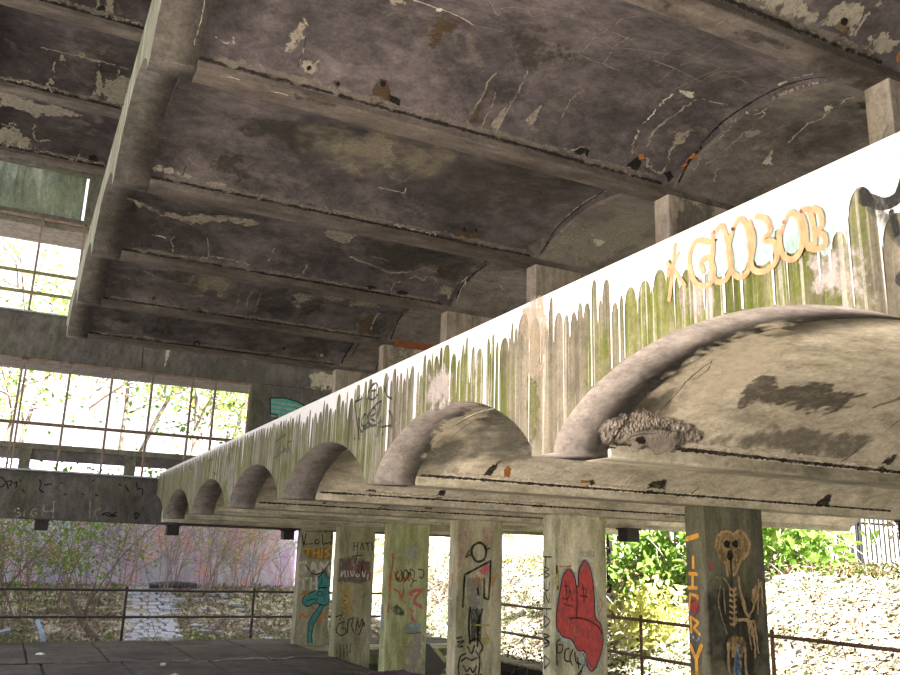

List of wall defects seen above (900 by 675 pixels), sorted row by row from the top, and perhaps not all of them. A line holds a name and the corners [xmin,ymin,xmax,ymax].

peeling [285,18,308,52]
peeling [0,47,131,150]
crack [89,16,859,365]
damp [677,199,714,233]
damp [811,253,863,294]
damp [737,376,867,459]